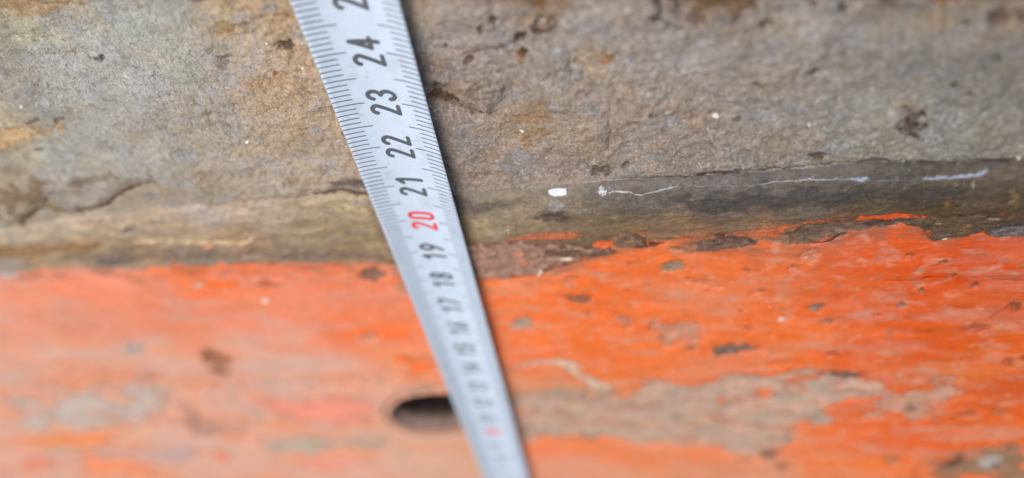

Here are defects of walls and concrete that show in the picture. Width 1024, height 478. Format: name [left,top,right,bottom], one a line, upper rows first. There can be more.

peeling [977,212,1024,238]
spalling [466,213,938,280]
peeling [508,317,533,329]
peeling [566,293,594,318]
peeling [650,322,701,350]
peeling [712,325,759,357]
peeling [806,303,835,324]
peeling [507,359,975,471]
spalling [921,443,1024,478]